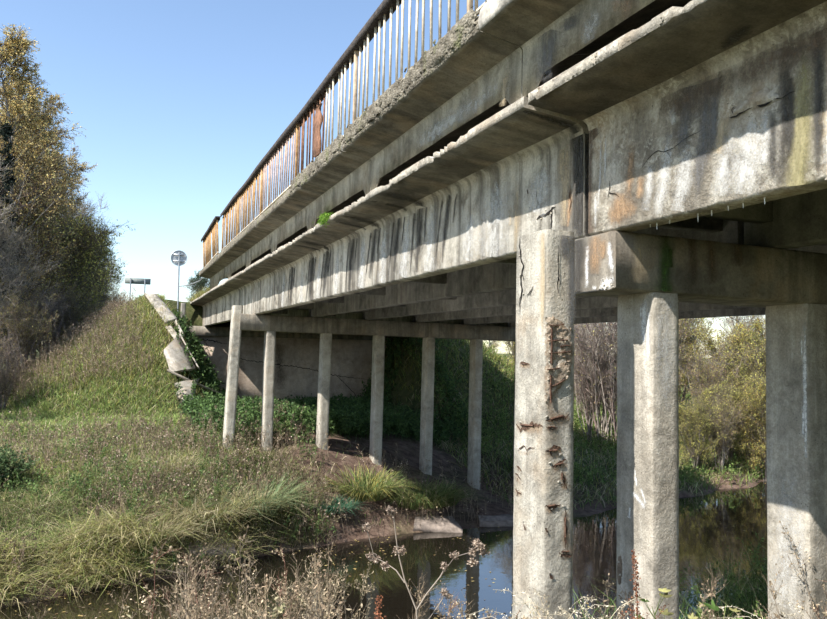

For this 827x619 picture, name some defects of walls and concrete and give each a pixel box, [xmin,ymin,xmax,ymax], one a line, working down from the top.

water stain [647,148,670,208]
water stain [664,79,719,203]
crack [729,91,795,118]
water stain [729,30,827,185]
water stain [282,193,456,302]
crack [519,240,533,311]
crack [536,190,561,293]
crack [198,338,360,394]
spalling [544,316,574,403]